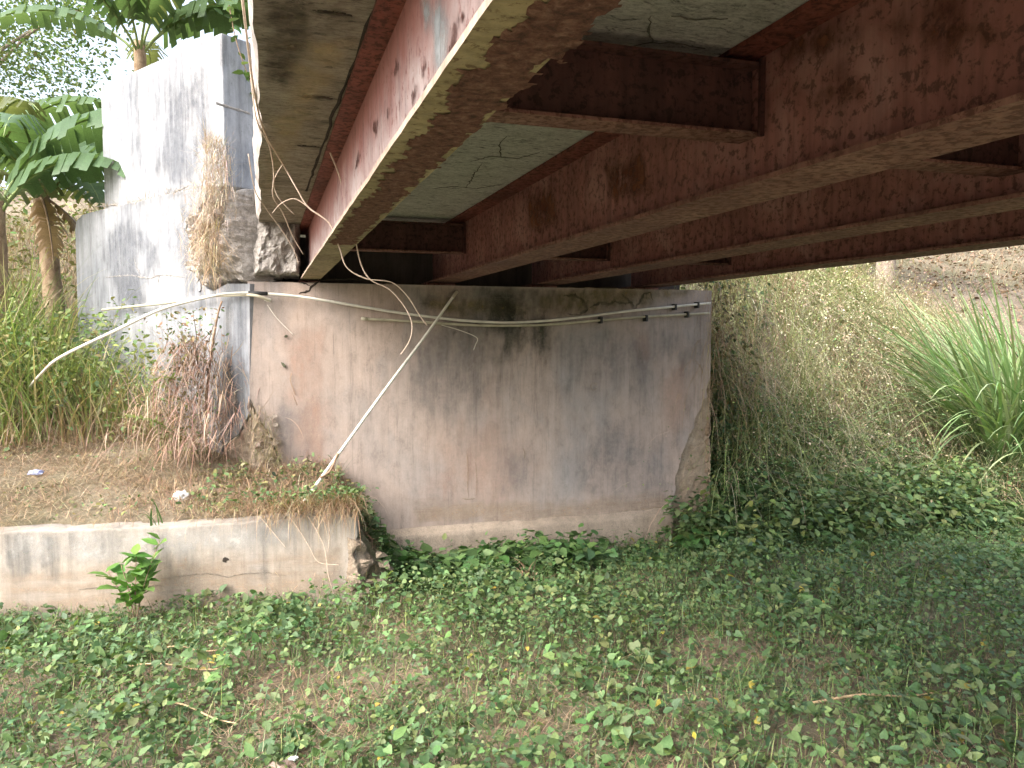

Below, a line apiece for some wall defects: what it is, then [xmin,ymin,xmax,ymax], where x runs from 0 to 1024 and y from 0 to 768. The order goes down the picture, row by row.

leakage [162,75,205,184]
rust [329,0,623,245]
crack [433,136,540,189]
spalling [184,189,301,292]
flaking render [672,381,711,532]